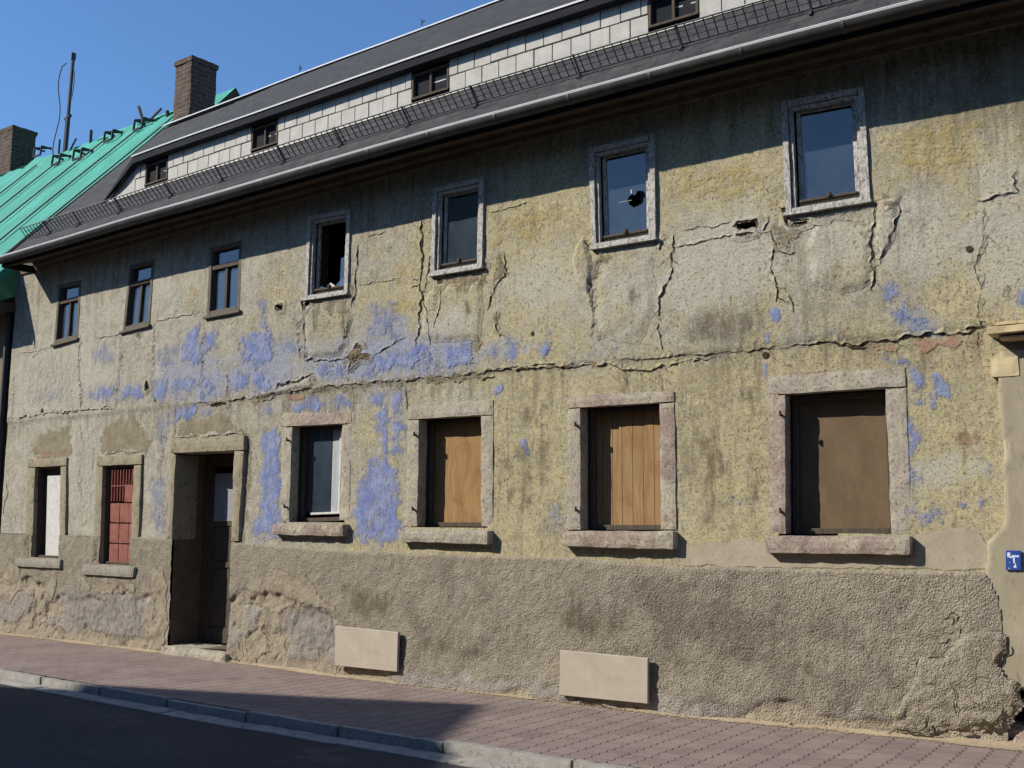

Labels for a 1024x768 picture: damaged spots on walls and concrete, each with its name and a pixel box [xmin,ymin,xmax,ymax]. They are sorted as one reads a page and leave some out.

crack [7,170,1018,501]